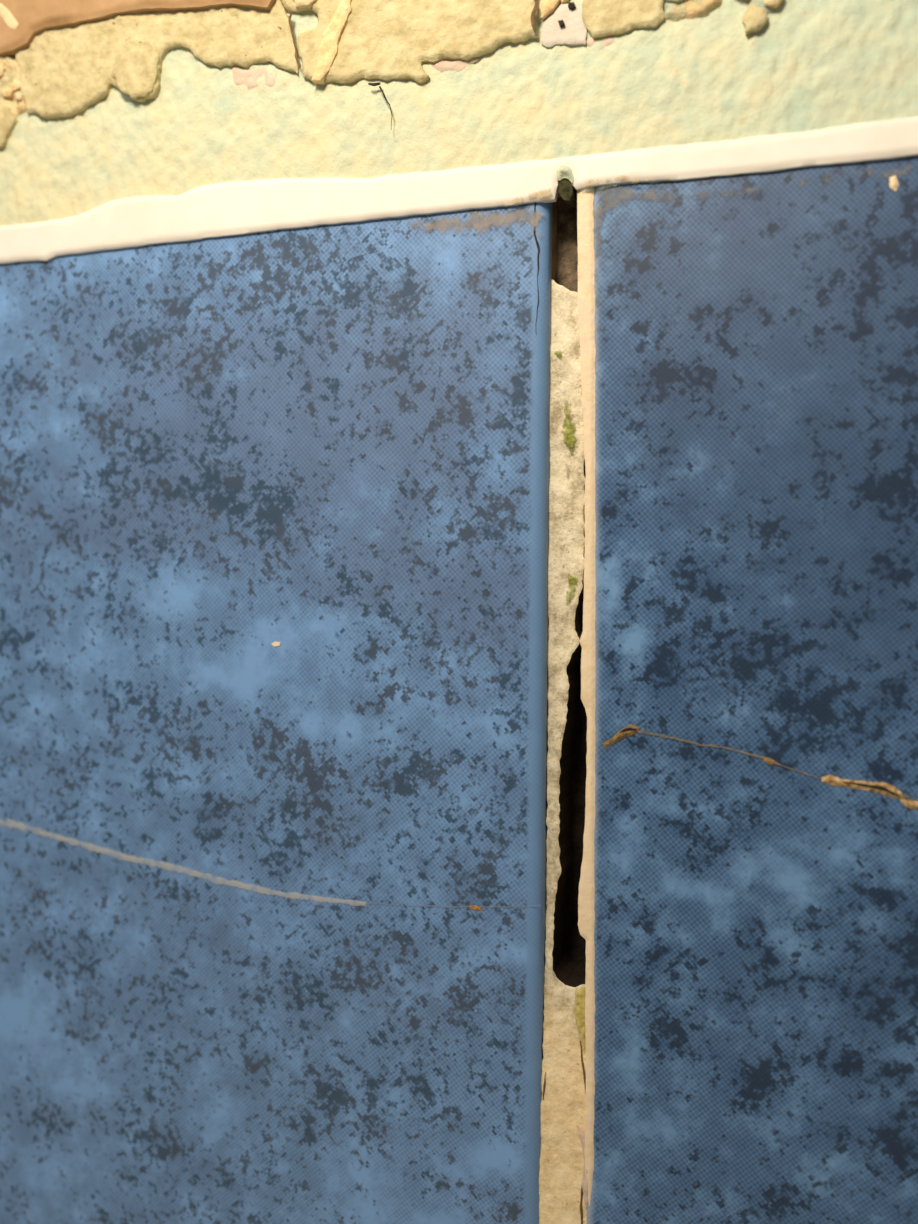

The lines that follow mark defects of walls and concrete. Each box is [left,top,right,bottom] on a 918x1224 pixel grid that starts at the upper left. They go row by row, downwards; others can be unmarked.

flaking render [742,0,783,35]
flaking render [0,0,723,149]
crack [533,203,541,335]
crack [602,724,918,810]
crack [0,819,539,911]